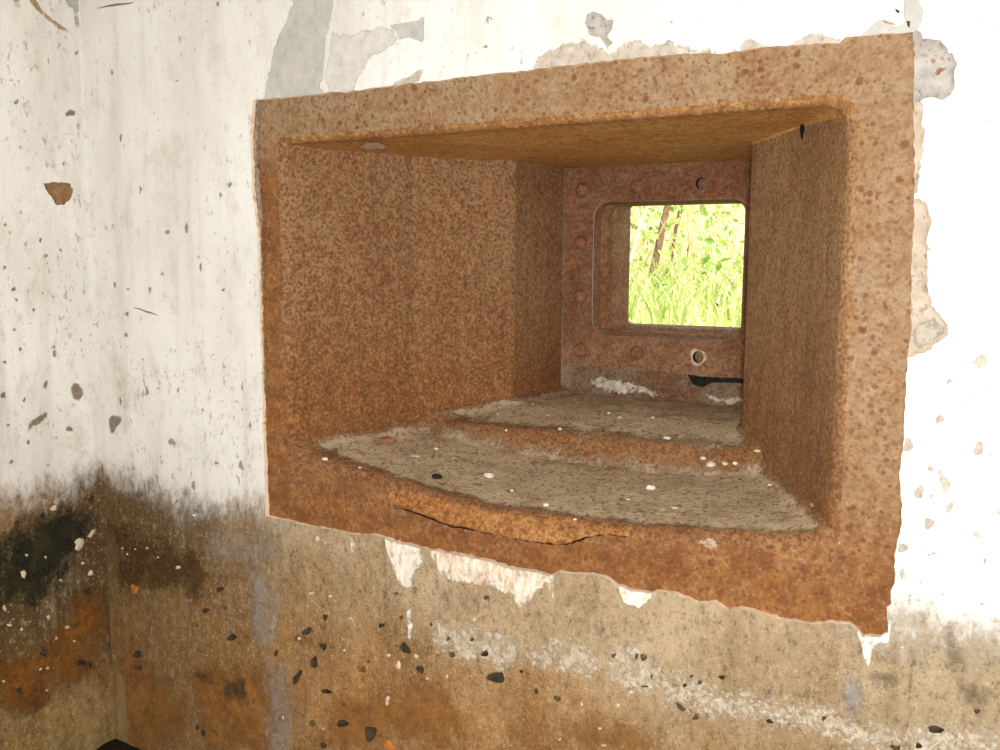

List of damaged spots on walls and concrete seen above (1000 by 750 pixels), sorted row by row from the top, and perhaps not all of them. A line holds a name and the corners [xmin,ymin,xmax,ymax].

peeling [264,0,424,99]
peeling [533,11,715,69]
spalling [861,0,958,358]
crack [394,507,626,545]
leakage [0,465,1000,750]